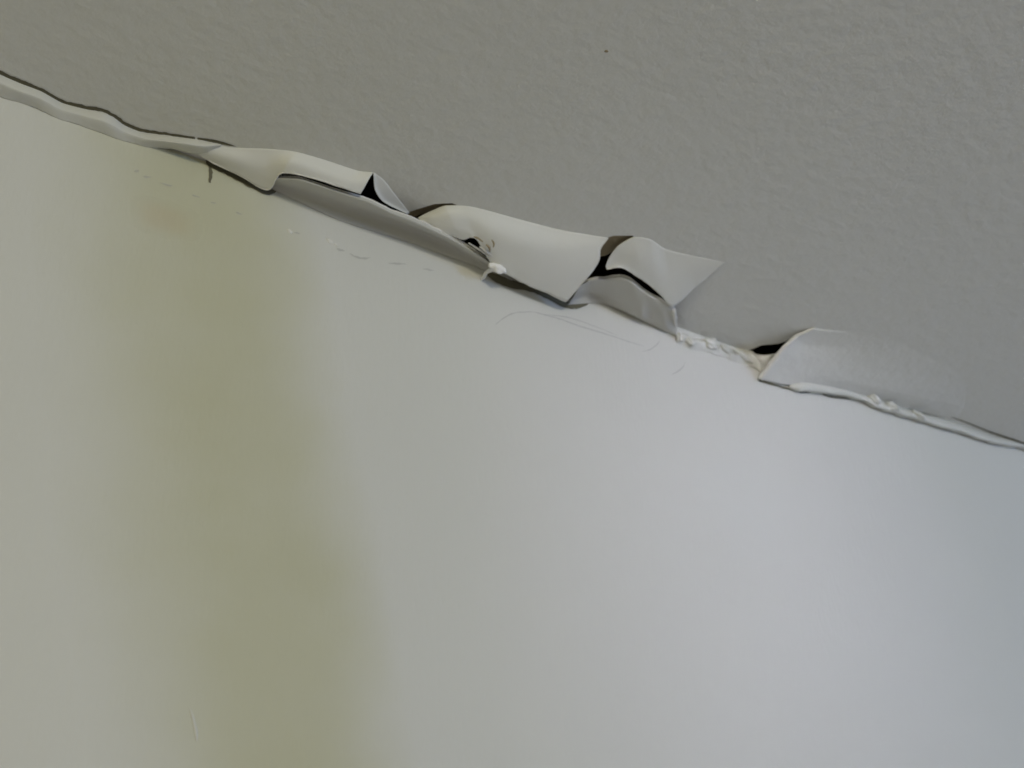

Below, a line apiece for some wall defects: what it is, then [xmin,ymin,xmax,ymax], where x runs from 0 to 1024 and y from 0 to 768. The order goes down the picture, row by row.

crack [0,71,242,215]
peeling [198,145,724,307]
peeling [676,327,966,419]